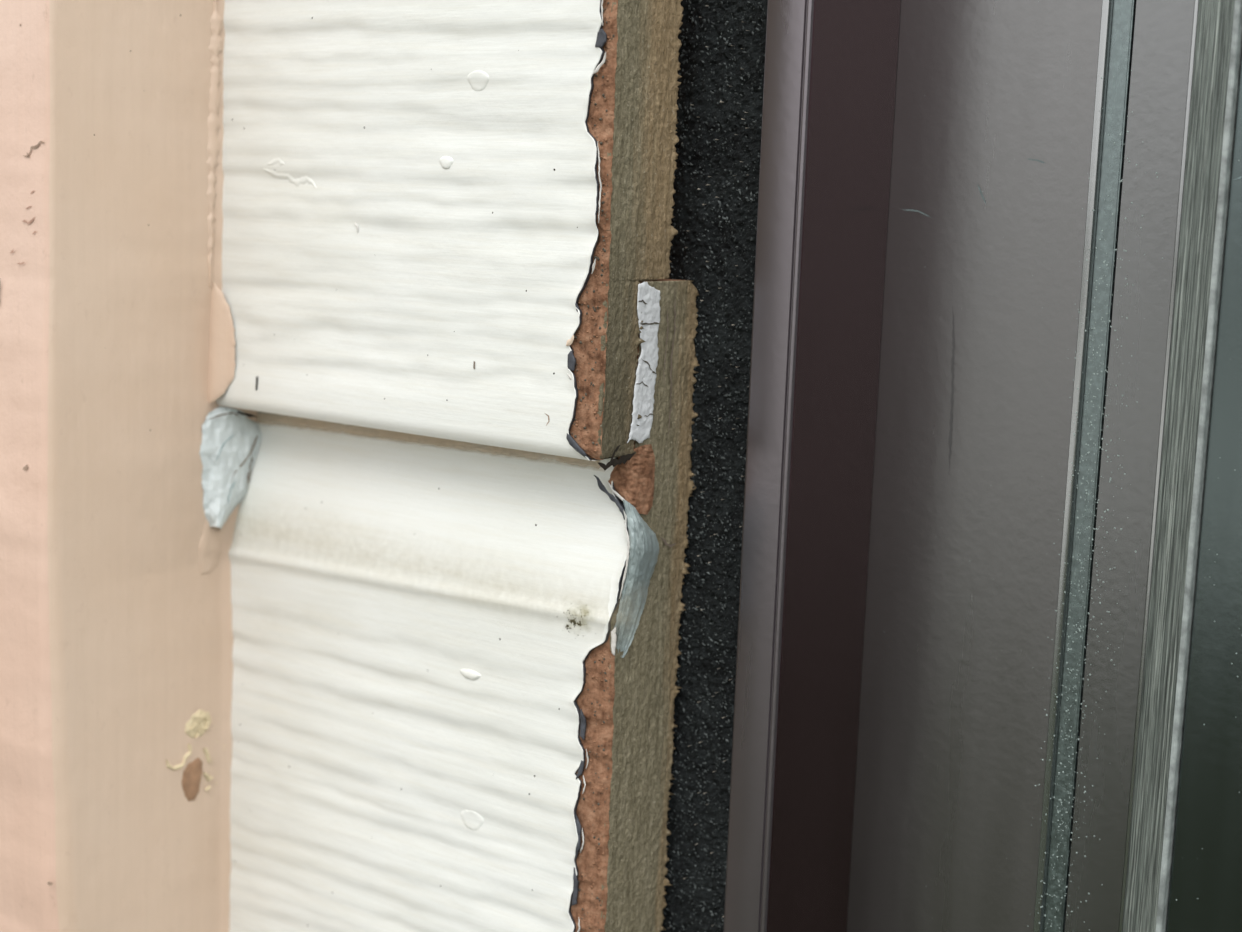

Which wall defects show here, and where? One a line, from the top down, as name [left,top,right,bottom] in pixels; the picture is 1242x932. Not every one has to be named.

spalling [566,0,662,932]